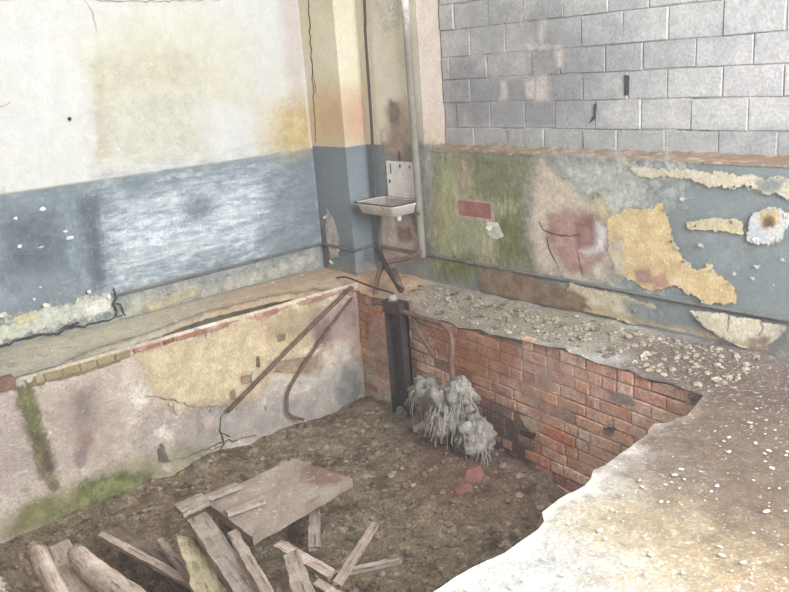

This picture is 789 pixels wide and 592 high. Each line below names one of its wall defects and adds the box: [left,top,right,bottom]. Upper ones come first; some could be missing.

crack [86,0,202,31]
crack [308,0,317,141]
leakage [380,102,408,162]
peeling [0,209,340,344]
leakage [419,143,535,260]
crack [539,222,583,276]
peeling [480,154,789,352]
crack [146,395,256,460]
spalling [0,282,693,592]